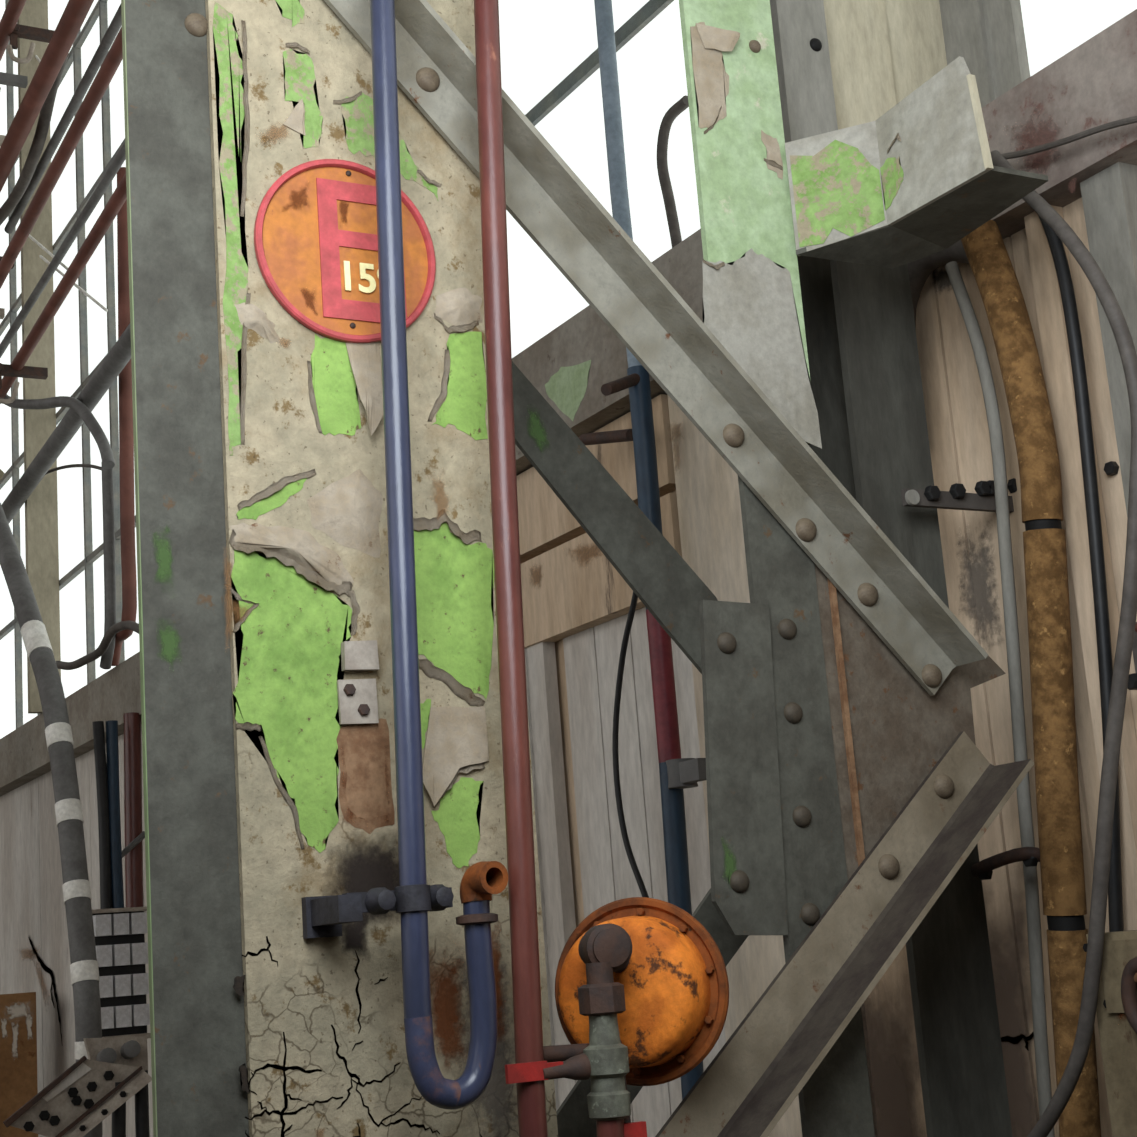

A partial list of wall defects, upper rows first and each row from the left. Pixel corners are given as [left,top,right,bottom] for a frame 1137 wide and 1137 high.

peeling [213,2,251,456]
peeling [761,130,904,247]
peeling [307,334,384,436]
peeling [428,313,488,440]
peeling [224,469,360,853]
peeling [413,509,494,869]
crack [28,937,62,1042]
crack [241,936,278,966]
crack [245,950,440,1137]
corrosion [430,962,464,1065]
corrosion [492,932,504,1037]
crack [1001,1032,1034,1051]